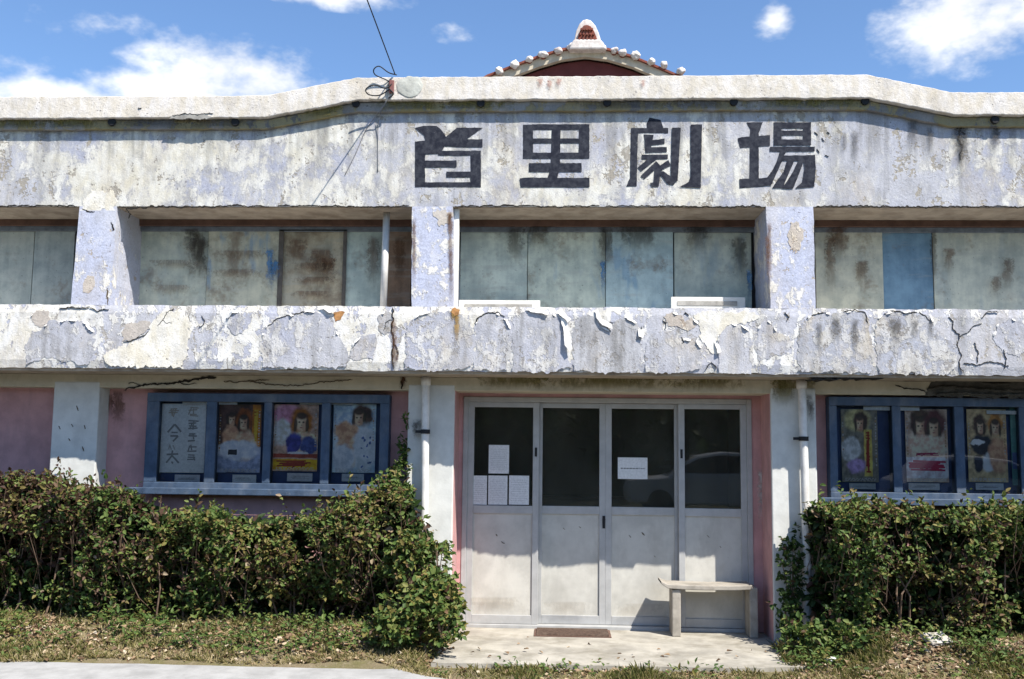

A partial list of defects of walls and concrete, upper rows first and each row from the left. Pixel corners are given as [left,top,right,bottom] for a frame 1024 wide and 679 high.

peeling [787,221,804,253]
peeling [24,309,192,369]
peeling [226,310,246,335]
crack [125,376,351,391]
peeling [259,306,392,369]
crack [385,307,405,389]
rust [451,307,460,331]
peeling [404,308,1024,399]
crack [785,309,1009,372]